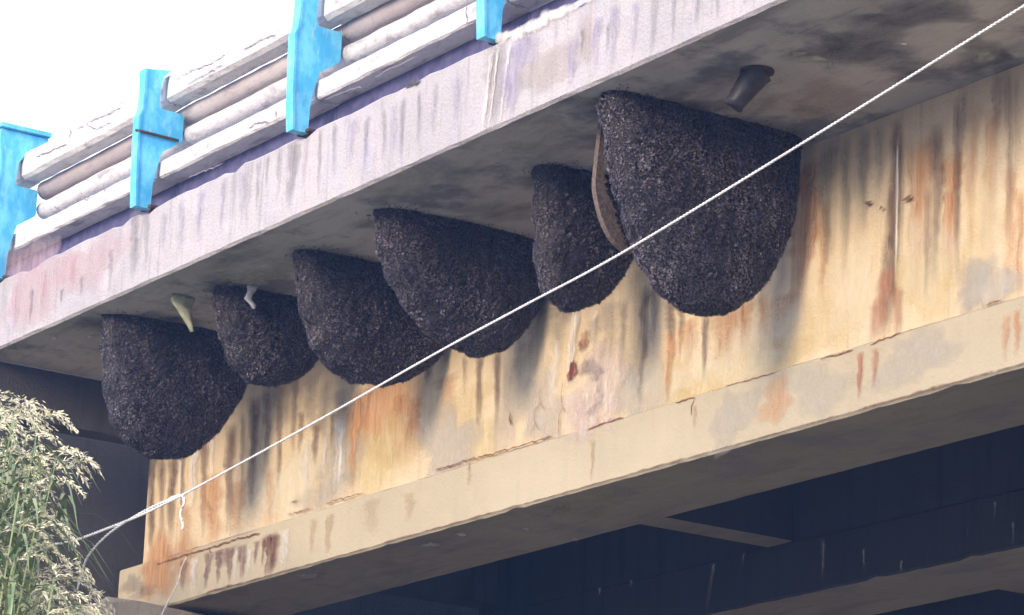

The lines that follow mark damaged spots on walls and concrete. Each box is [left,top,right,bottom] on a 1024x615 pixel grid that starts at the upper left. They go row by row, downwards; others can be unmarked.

water stain [483,46,525,117]
corrosion [793,170,825,273]
crack [436,384,565,470]
corrosion [207,363,1024,593]
crack [156,533,260,565]